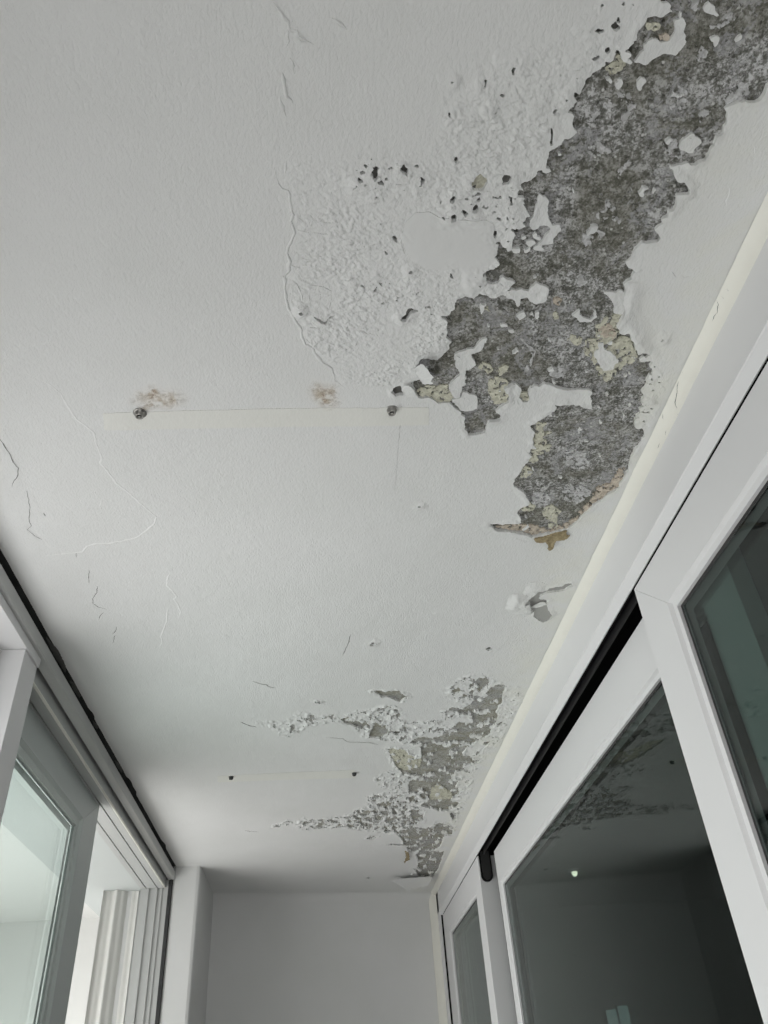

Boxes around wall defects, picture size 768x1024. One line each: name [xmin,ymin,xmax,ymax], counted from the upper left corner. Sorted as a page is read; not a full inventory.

crack [272,1,313,129]
crack [274,162,343,387]
spalling [402,0,768,551]
peeling [529,583,571,622]
spalling [290,676,505,892]